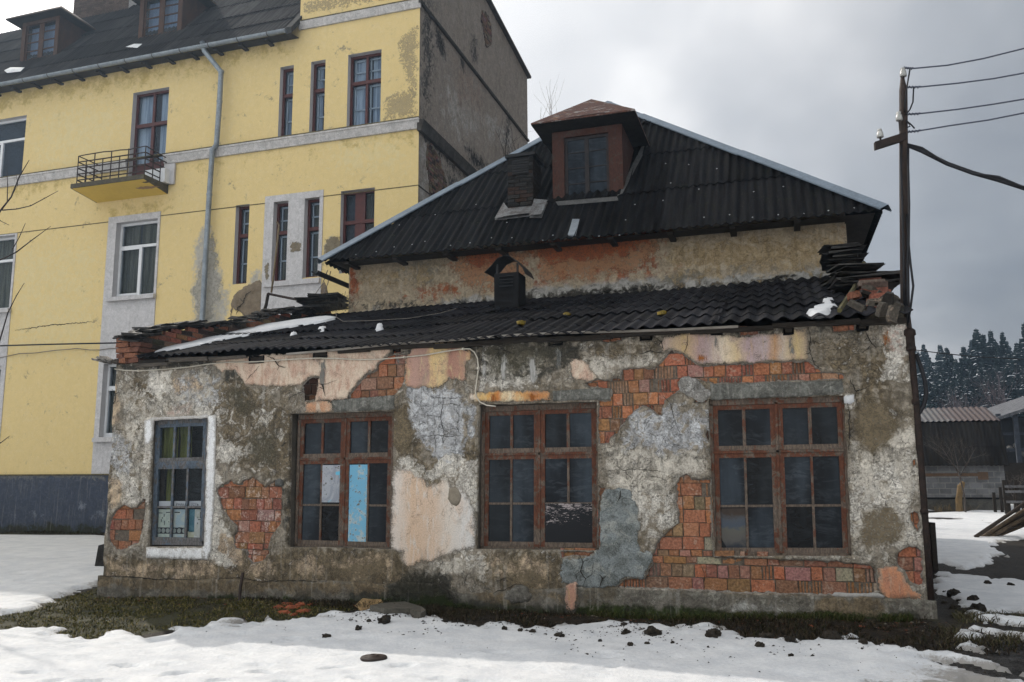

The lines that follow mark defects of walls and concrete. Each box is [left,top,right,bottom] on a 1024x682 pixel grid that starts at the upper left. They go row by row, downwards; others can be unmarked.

peeling [383,26,419,121]
peeling [193,234,269,321]
peeling [203,342,471,413]
spalling [570,326,845,445]
spalling [108,499,145,551]
spalling [215,477,284,564]
spalling [618,474,925,600]